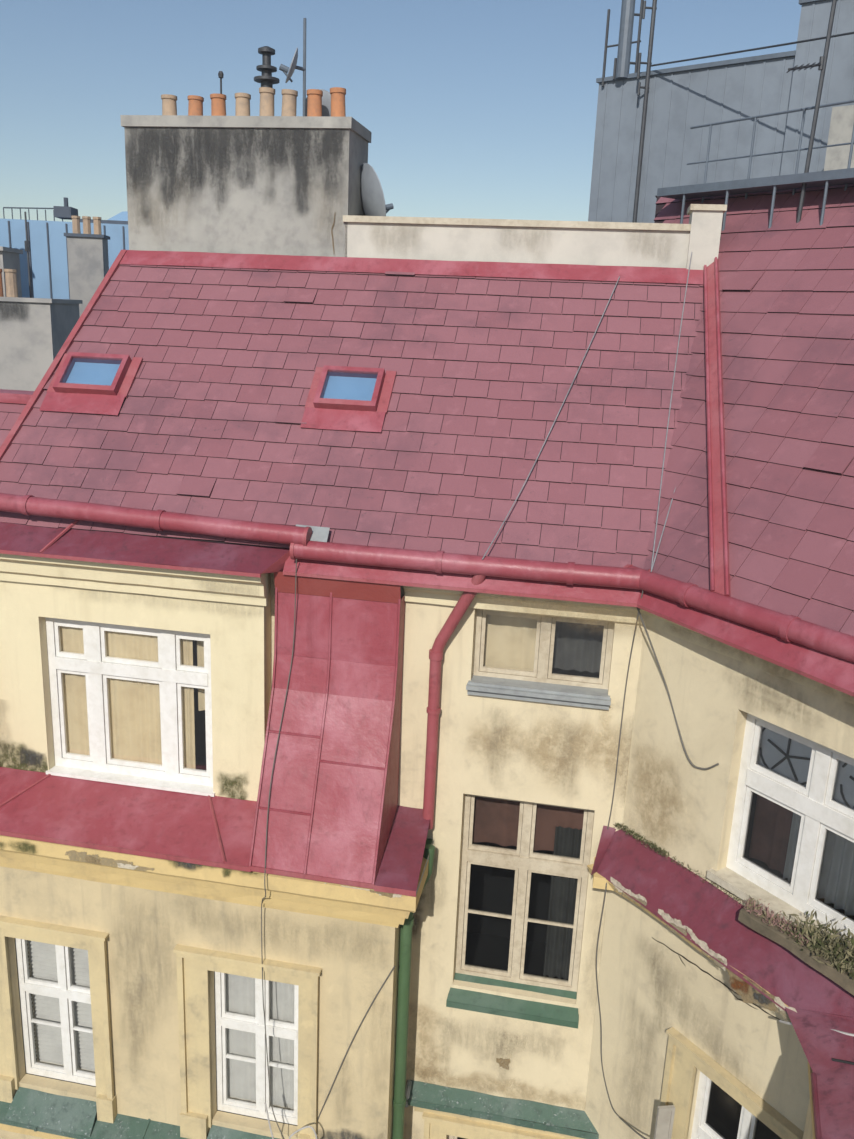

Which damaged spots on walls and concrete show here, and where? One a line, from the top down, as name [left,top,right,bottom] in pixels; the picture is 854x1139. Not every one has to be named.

water stain [136,127,178,202]
water stain [270,128,308,211]
water stain [322,129,339,188]
water stain [21,749,42,765]
spalling [610,877,797,1022]
crack [652,937,779,1020]
water stain [322,1131,362,1139]